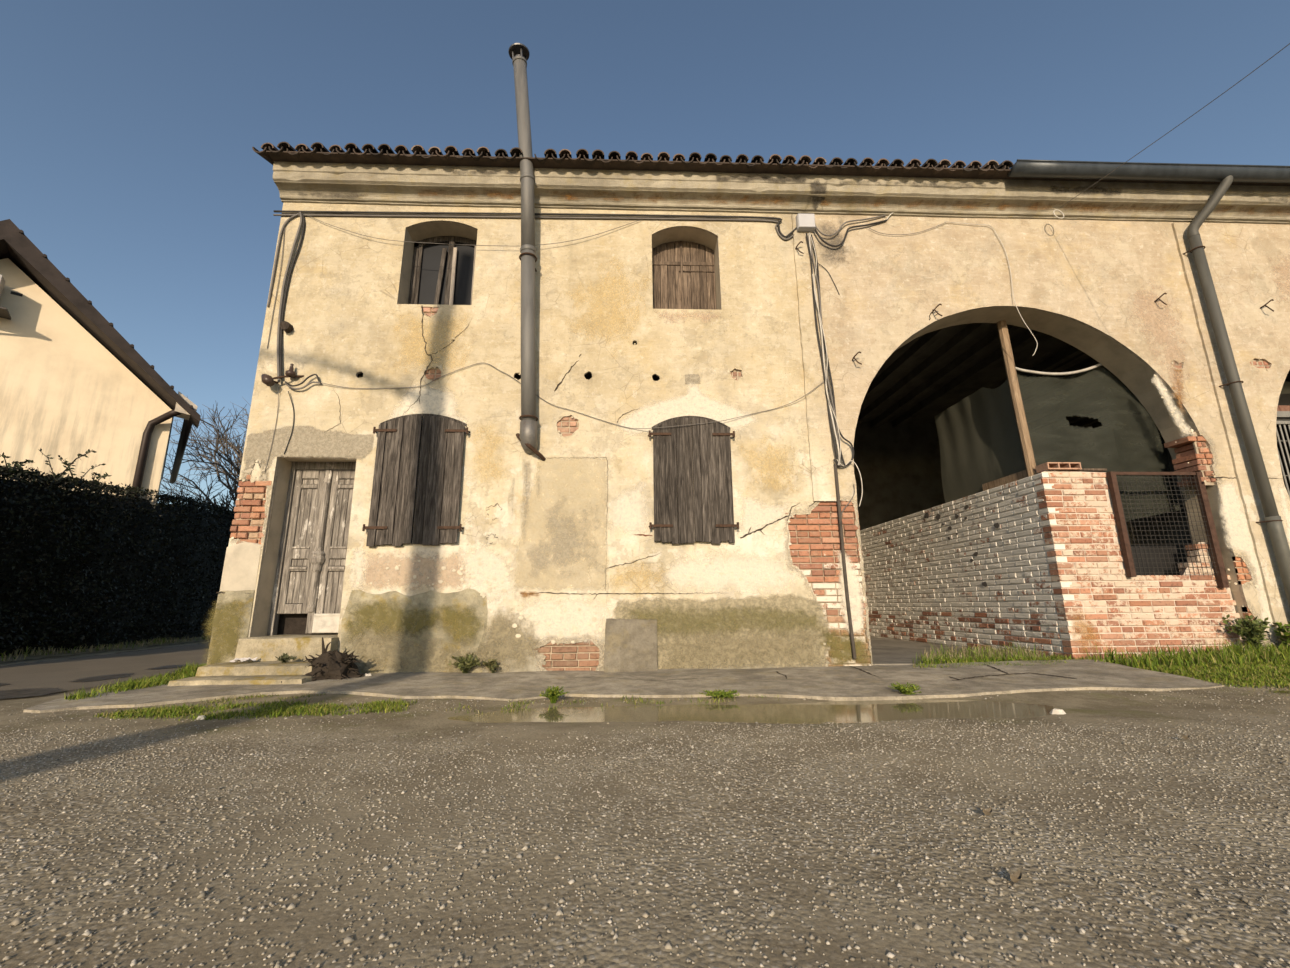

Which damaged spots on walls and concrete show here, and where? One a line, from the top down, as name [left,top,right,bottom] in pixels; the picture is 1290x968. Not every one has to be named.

crack [407,305,470,411]
flaking render [557,415,579,437]
flaking render [230,459,278,553]
peeling [350,544,514,600]
flaking render [785,496,873,667]
water stain [353,634,495,673]
peeling [512,596,605,671]